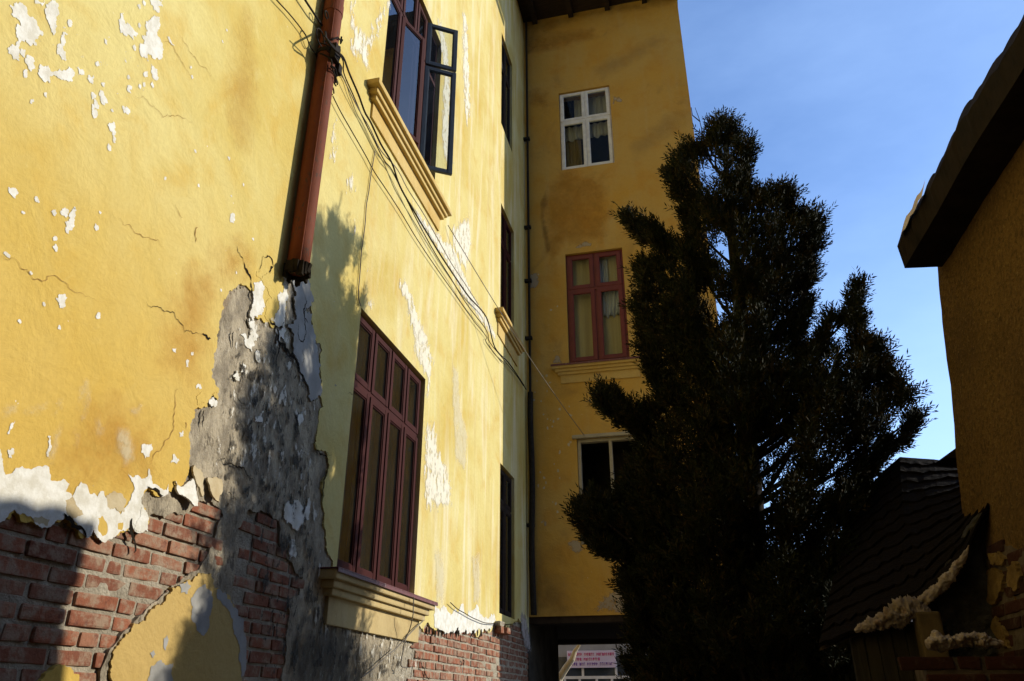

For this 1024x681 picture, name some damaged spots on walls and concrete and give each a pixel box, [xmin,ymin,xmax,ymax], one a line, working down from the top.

peeling [8,0,130,151]
peeling [119,0,175,93]
peeling [350,0,391,67]
peeling [51,206,76,252]
crack [3,256,94,299]
crack [147,247,308,387]
crack [153,393,204,456]
flaking render [0,271,528,681]